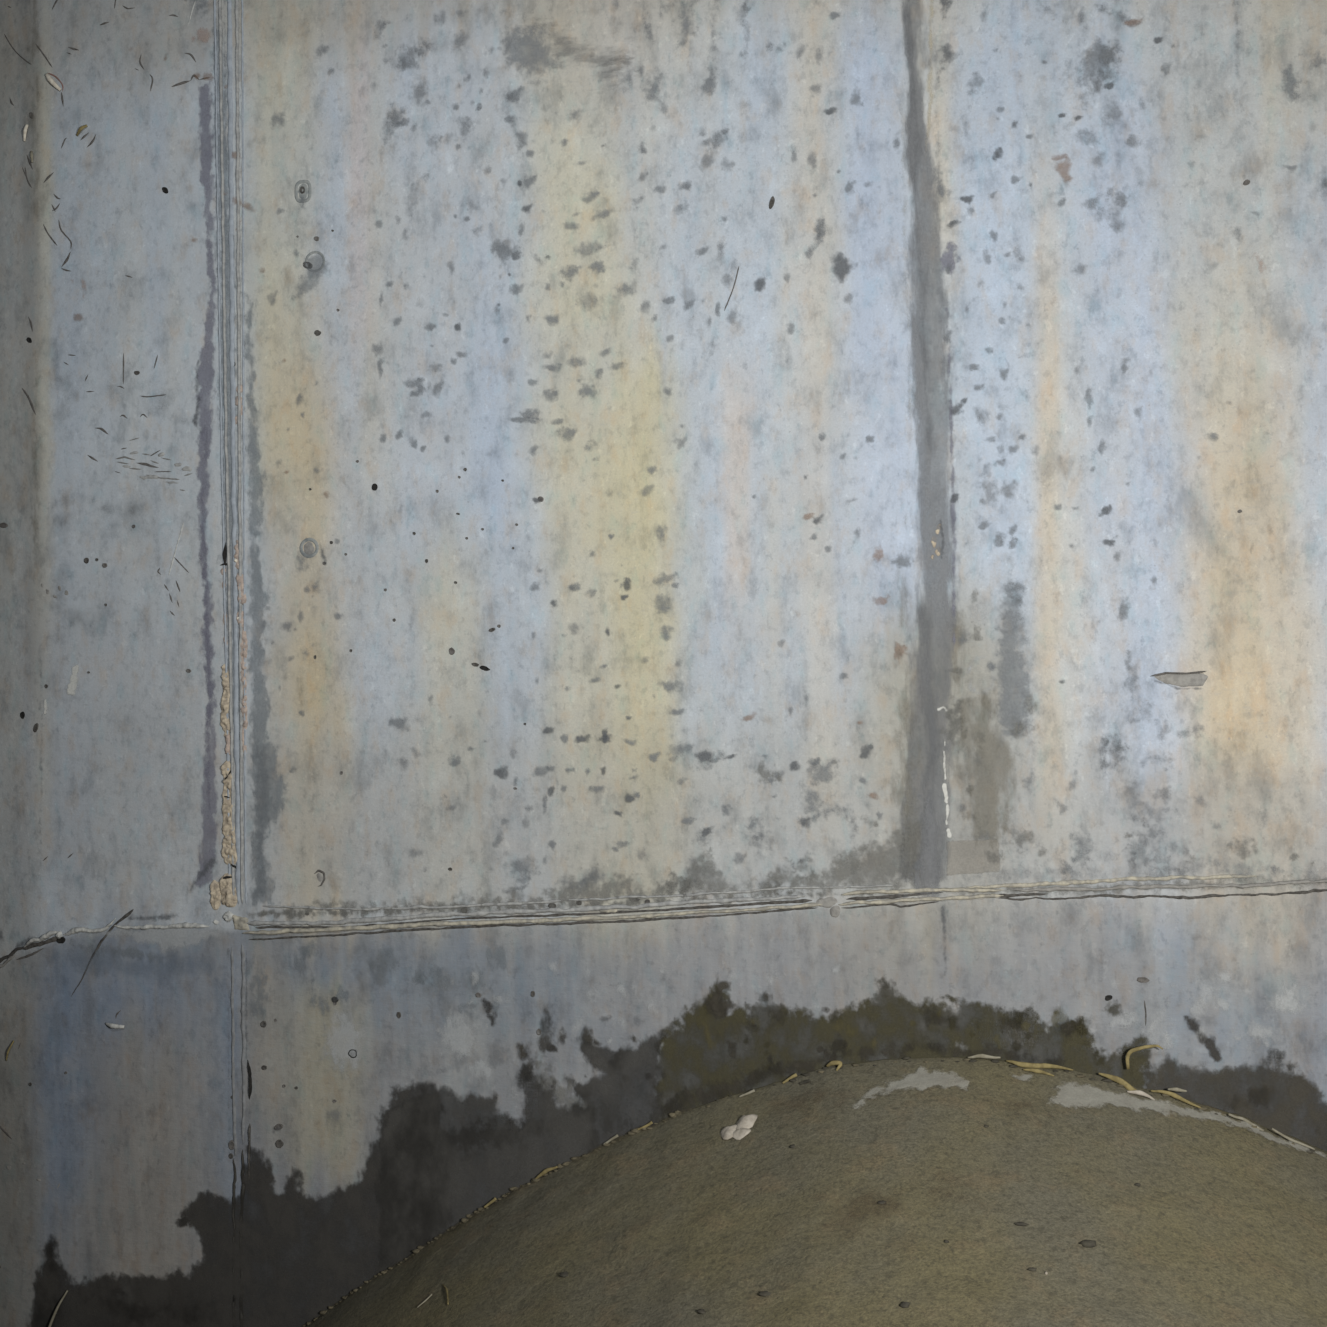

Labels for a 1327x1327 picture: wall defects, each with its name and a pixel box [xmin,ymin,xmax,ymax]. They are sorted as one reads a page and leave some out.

damp [200,88,212,192]
damp [193,215,215,509]
damp [759,35,980,896]
damp [200,540,216,718]
damp [196,746,217,887]
crack [0,909,215,995]
damp [432,876,641,912]
crack [249,892,943,940]
crack [999,889,1327,901]
damp [856,1067,968,1108]
damp [1053,1016,1327,1157]
damp [31,1012,664,1327]